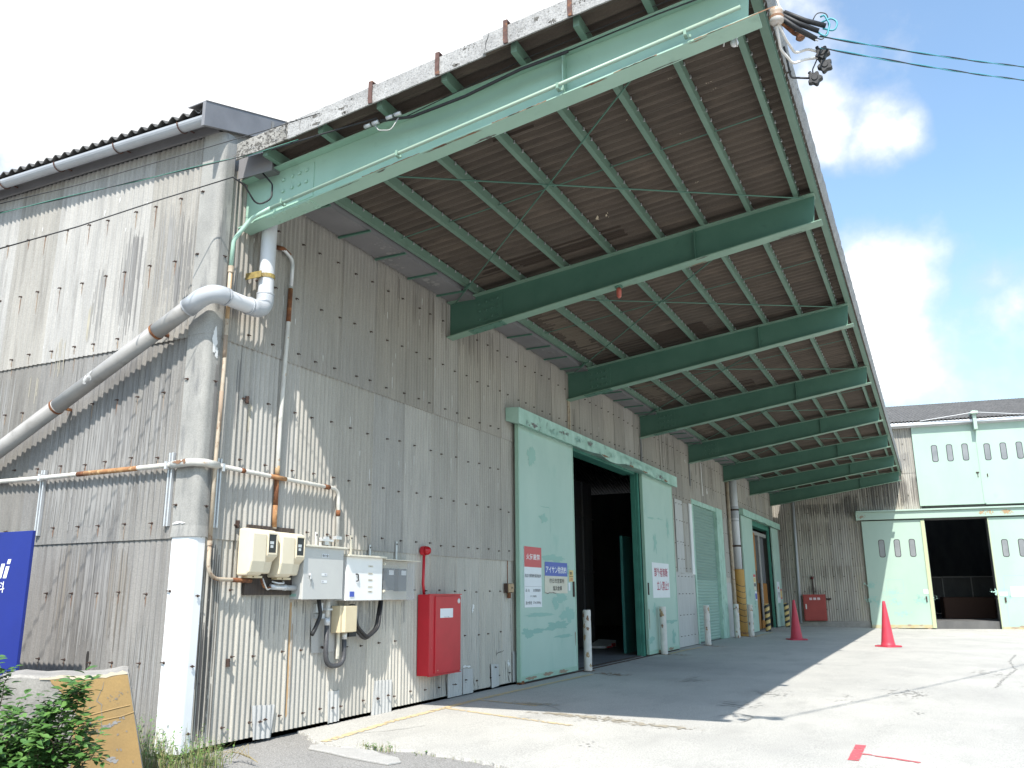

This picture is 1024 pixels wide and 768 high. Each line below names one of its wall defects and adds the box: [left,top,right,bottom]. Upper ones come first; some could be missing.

water stain [88,206,196,343]
rust [76,459,137,477]
rust [270,466,287,527]
crack [996,655,1016,687]